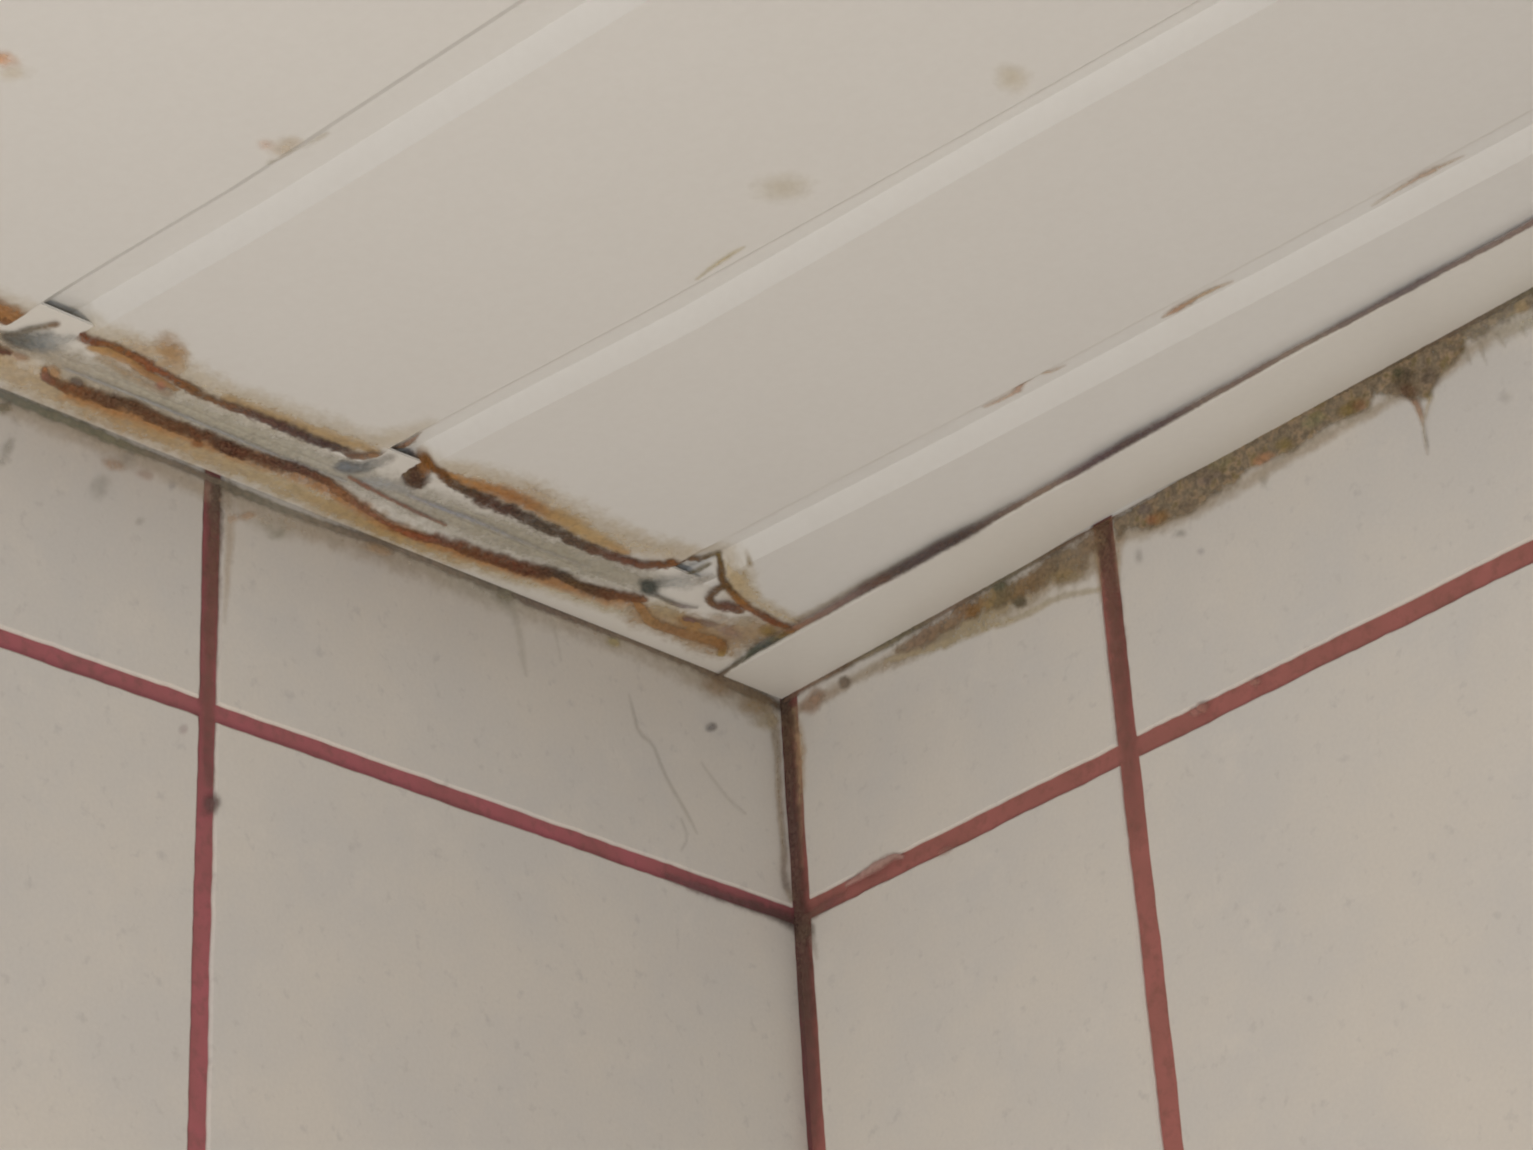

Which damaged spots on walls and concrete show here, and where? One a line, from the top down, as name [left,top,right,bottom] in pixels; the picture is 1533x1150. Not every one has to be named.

rust [0,304,800,677]
damp [0,287,1533,712]
damp [785,219,1533,632]